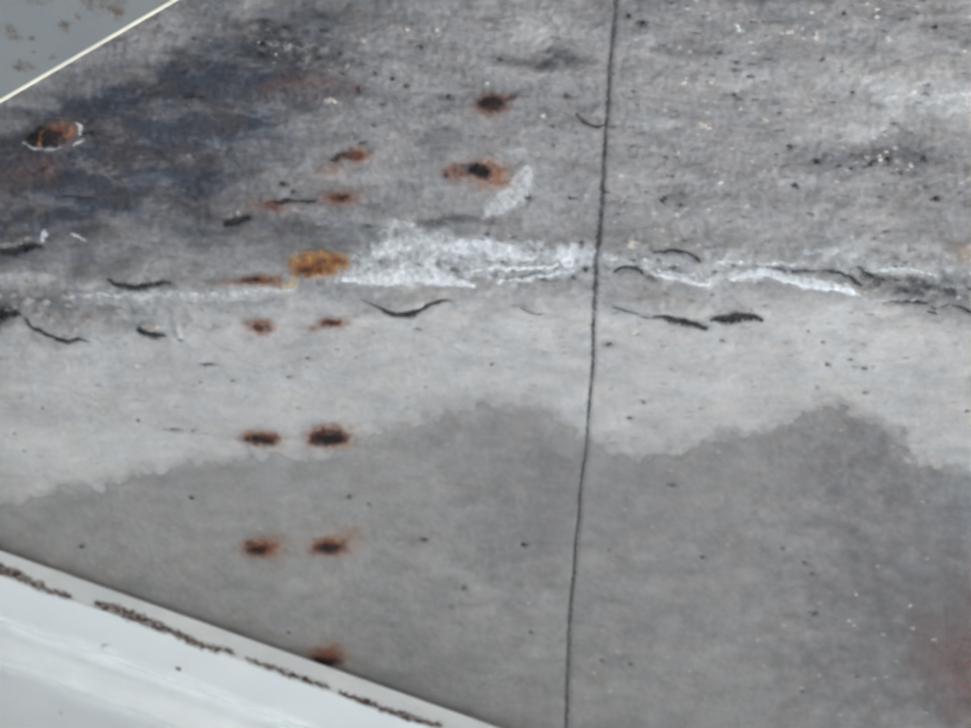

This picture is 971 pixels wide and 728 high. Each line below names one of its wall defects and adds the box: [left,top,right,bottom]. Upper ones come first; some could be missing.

rust [443,161,508,186]
rust [219,249,349,289]
leakage [335,220,617,288]
crack [613,249,701,274]
leakage [640,258,861,297]
crack [764,265,971,314]
crack [0,307,88,343]
crack [614,307,763,330]
rust [242,432,280,447]
rust [308,425,349,448]
leakage [0,402,971,728]
rust [94,600,442,728]